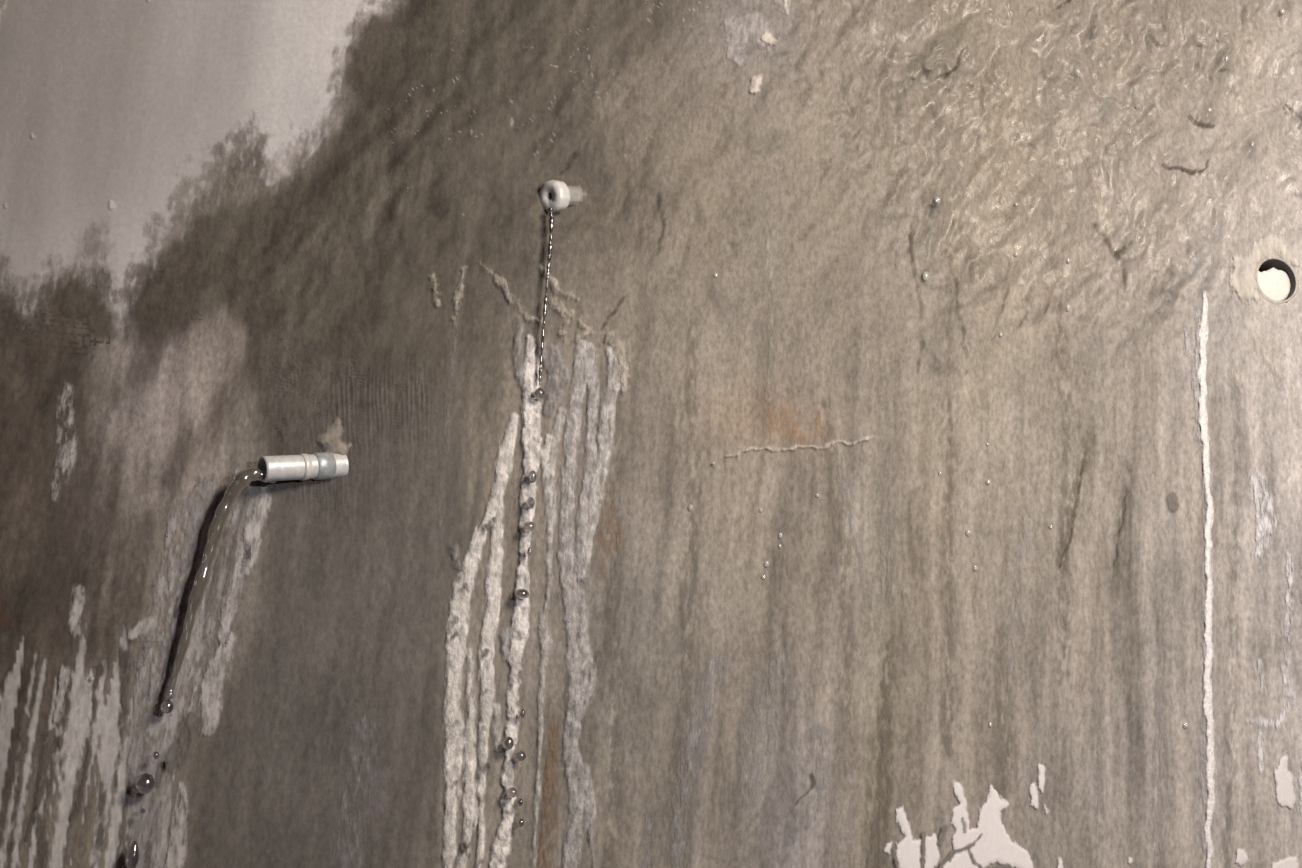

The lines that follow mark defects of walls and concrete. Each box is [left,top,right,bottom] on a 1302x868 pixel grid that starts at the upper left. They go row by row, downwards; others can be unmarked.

peeling [775,0,790,15]
peeling [724,12,780,93]
water stain [0,735,21,847]
water stain [16,712,45,868]
water stain [34,810,48,868]
water stain [40,756,65,868]
water stain [63,732,121,868]
water stain [115,737,153,868]
peeling [885,781,1033,868]
peeling [1030,764,1048,814]
peeling [1274,755,1296,808]
peeling [1272,856,1299,868]